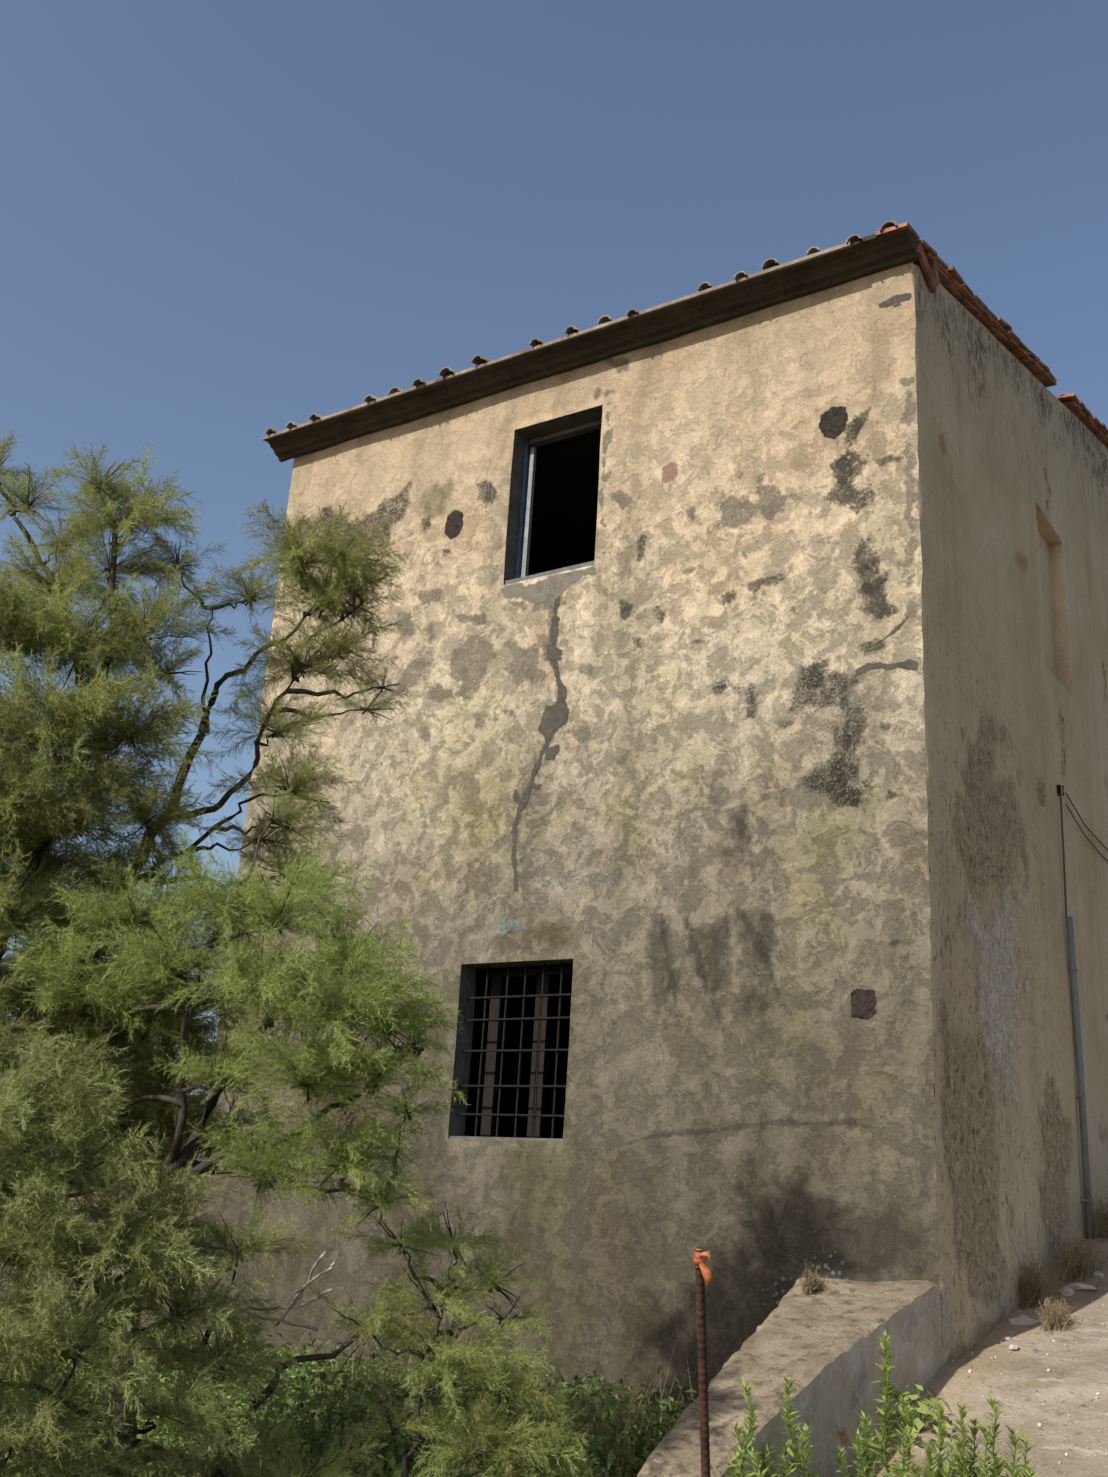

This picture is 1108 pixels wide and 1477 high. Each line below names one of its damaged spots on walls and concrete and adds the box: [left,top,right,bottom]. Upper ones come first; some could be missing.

spalling [819,406,848,438]
spalling [445,509,463,539]
crack [855,616,918,675]
crack [510,596,569,892]
spalling [954,717,1029,912]
spalling [851,989,877,1019]